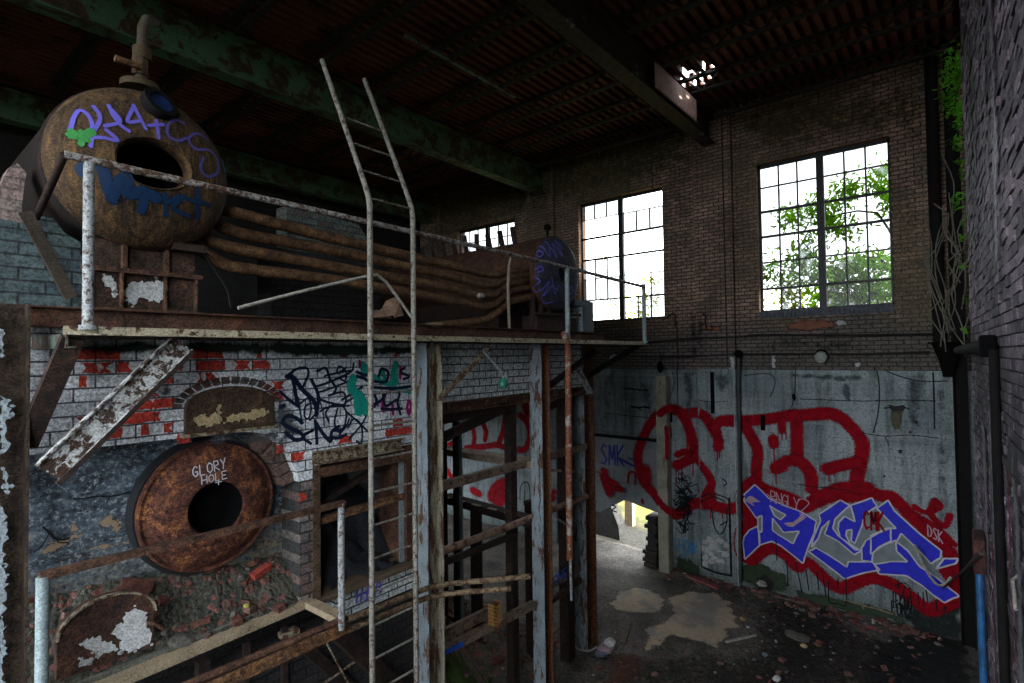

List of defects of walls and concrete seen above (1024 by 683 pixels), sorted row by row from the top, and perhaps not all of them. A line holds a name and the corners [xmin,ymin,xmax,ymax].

peeling [102,273,169,307]
peeling [68,335,641,444]
peeling [0,396,15,454]
peeling [1,467,14,494]
peeling [0,506,10,683]
peeling [78,605,154,667]